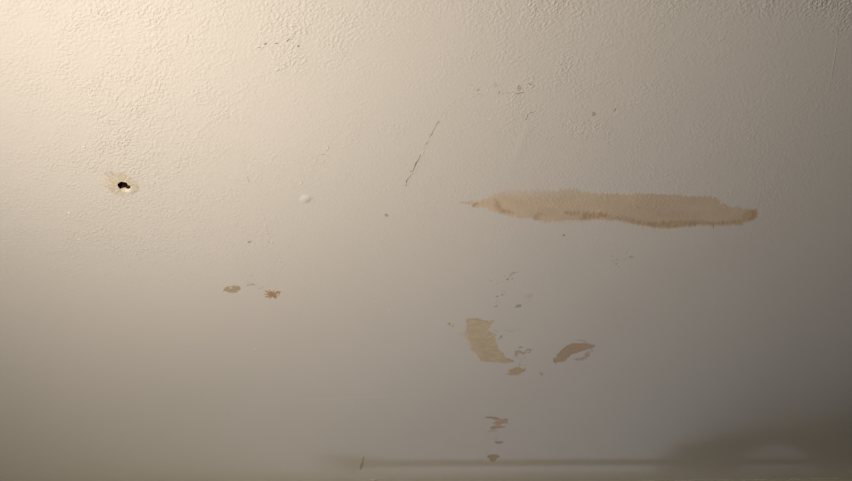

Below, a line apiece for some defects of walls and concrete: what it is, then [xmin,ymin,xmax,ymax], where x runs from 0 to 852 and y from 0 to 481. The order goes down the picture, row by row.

damp [458,187,760,233]
peeling [456,317,527,376]
peeling [552,339,597,365]